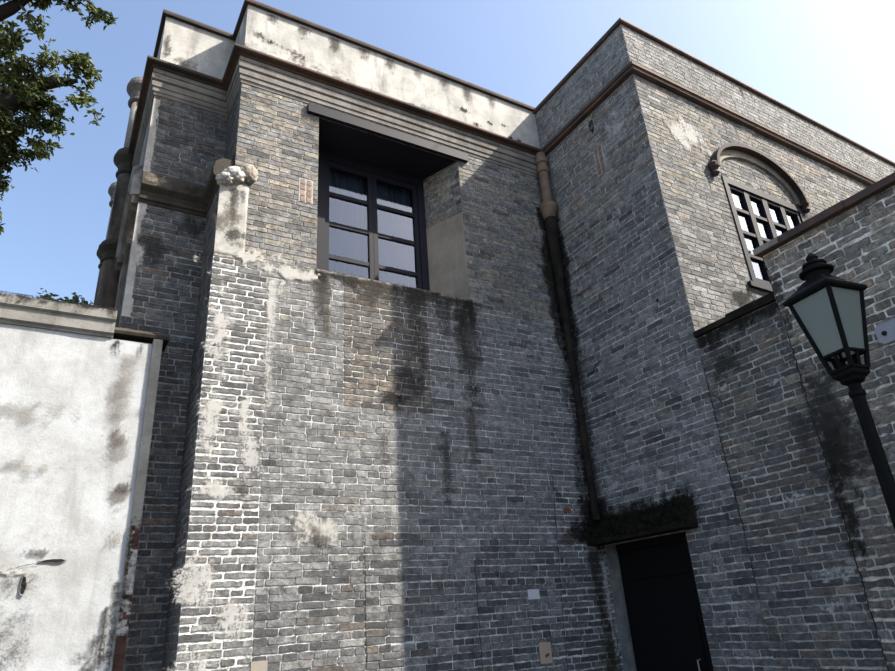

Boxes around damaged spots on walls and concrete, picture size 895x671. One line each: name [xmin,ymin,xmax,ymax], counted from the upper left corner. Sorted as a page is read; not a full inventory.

leakage [312,269,520,409]
leakage [536,199,732,524]
leakage [788,361,877,583]
peeling [112,516,141,671]